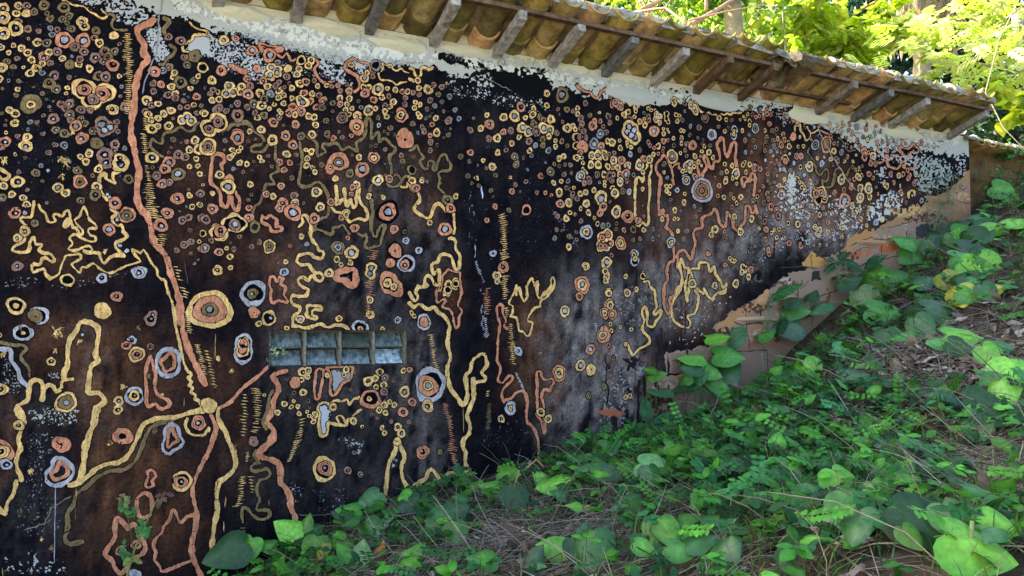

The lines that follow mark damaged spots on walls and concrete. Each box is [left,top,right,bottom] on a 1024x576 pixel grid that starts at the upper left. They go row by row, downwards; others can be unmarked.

flaking render [81,0,969,160]
peeling [480,207,584,331]
spalling [599,170,971,436]